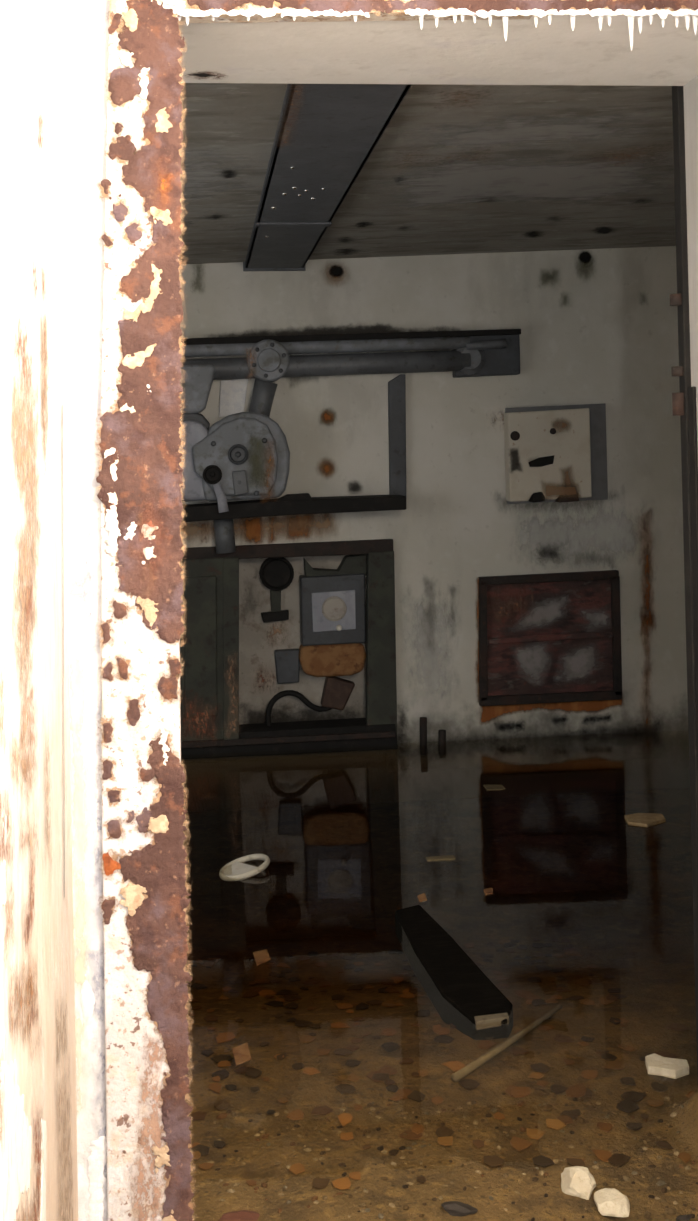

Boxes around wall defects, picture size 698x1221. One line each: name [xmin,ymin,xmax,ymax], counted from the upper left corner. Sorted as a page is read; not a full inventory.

leakage [177,8,370,18]
leakage [405,8,698,19]
leakage [393,115,660,207]
efflorescence [77,108,101,369]
corrosion [96,0,698,727]
corrosion [100,696,144,743]
leakage [399,713,659,756]
leakage [75,894,95,1061]
corrosion [100,727,195,1221]
leakage [59,1090,107,1221]